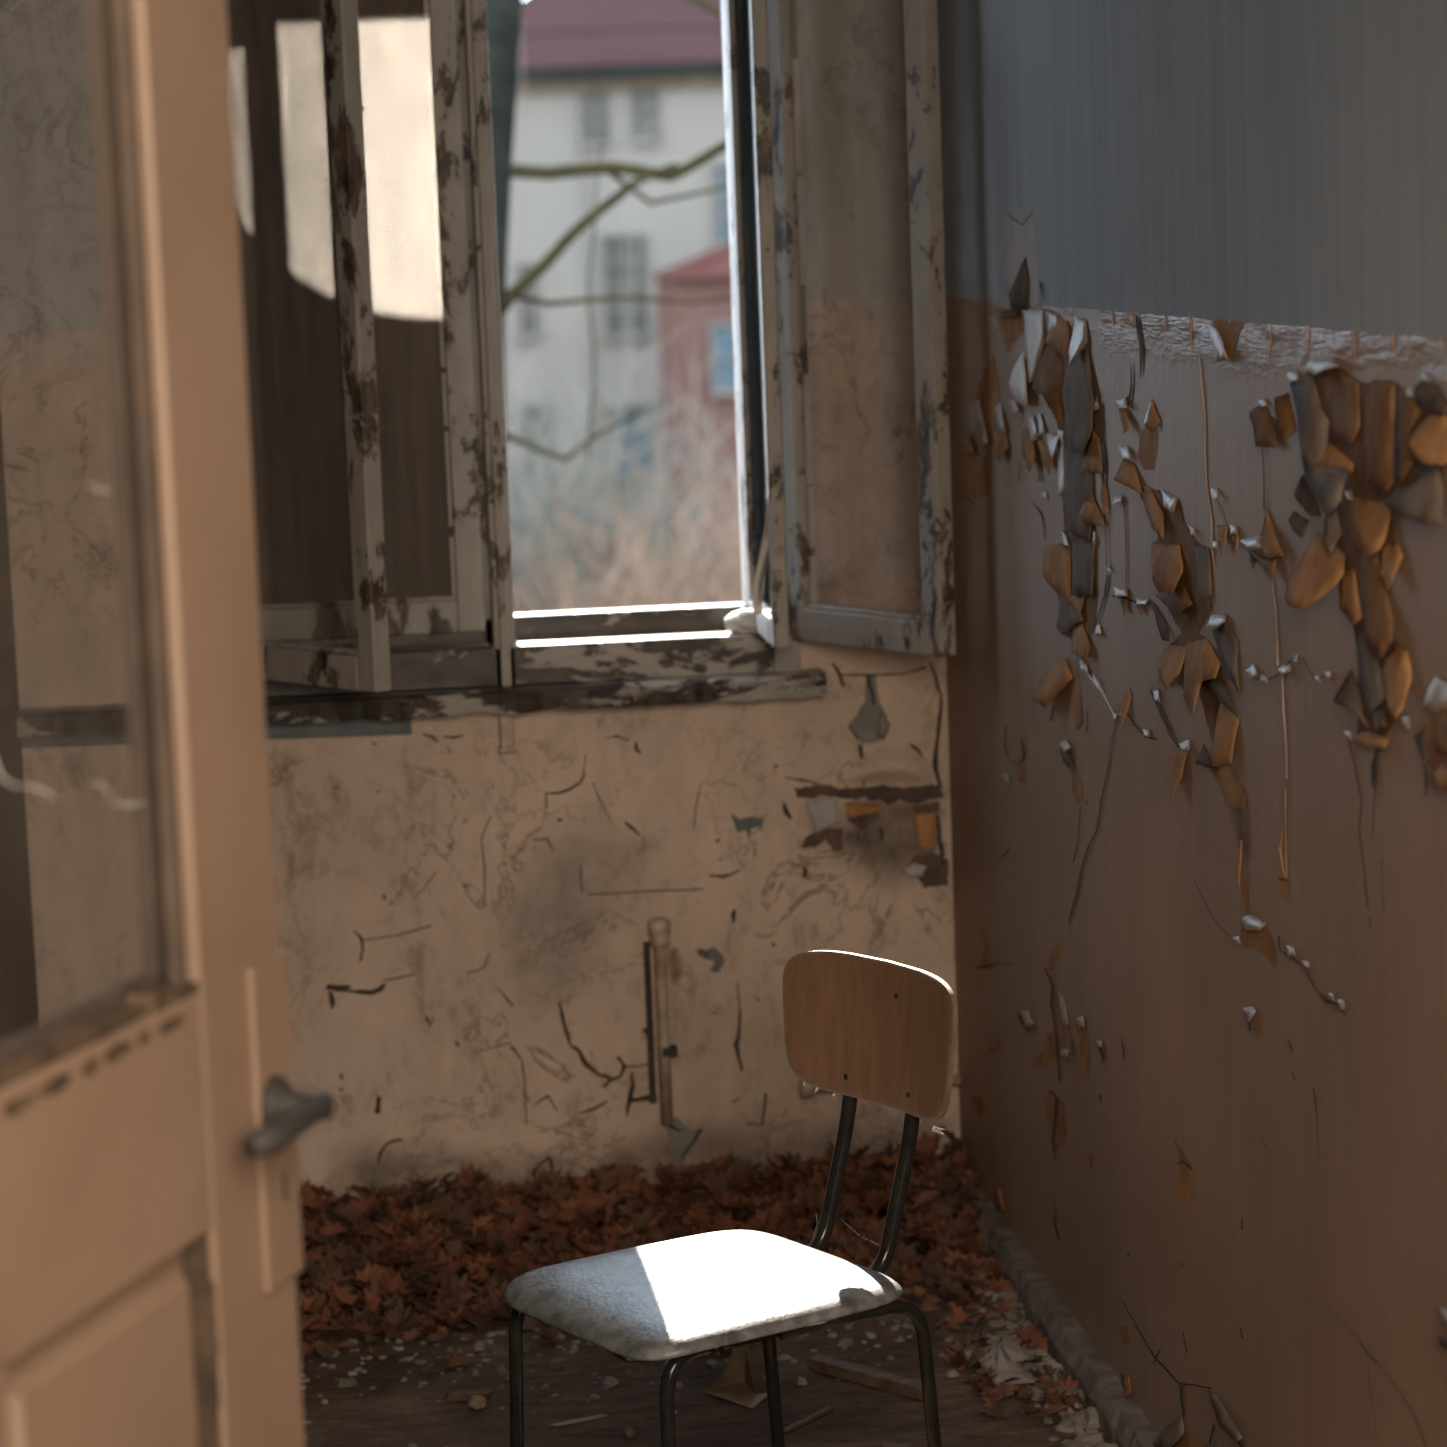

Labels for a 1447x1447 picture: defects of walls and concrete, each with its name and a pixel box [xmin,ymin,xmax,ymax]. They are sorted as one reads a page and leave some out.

peeling [957,208,1248,811]
peeling [1248,356,1447,797]
peeling [848,676,891,759]
crack [832,662,943,790]
crack [534,735,740,895]
flaking render [774,764,949,888]
crack [326,816,491,1009]
crack [467,954,513,1007]
crack [425,1003,657,1126]
crack [731,981,767,1126]